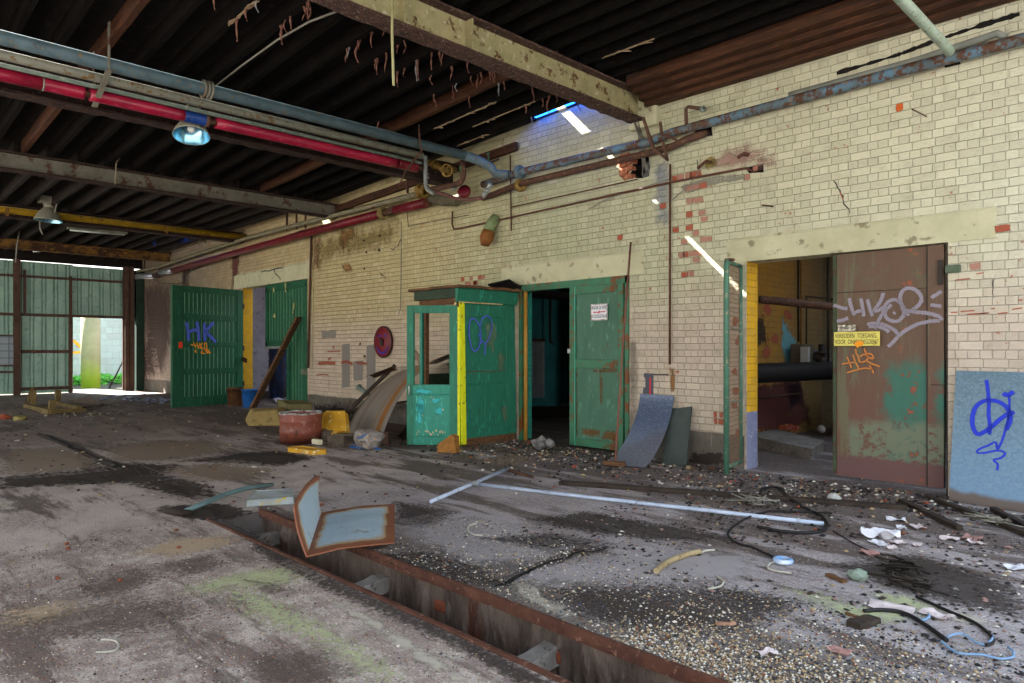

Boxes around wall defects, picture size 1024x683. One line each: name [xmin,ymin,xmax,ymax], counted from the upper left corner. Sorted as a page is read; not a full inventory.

spalling [617,152,638,181]
water stain [317,227,393,263]
peeling [672,170,712,277]
water stain [0,440,279,483]
peeling [381,409,1009,556]